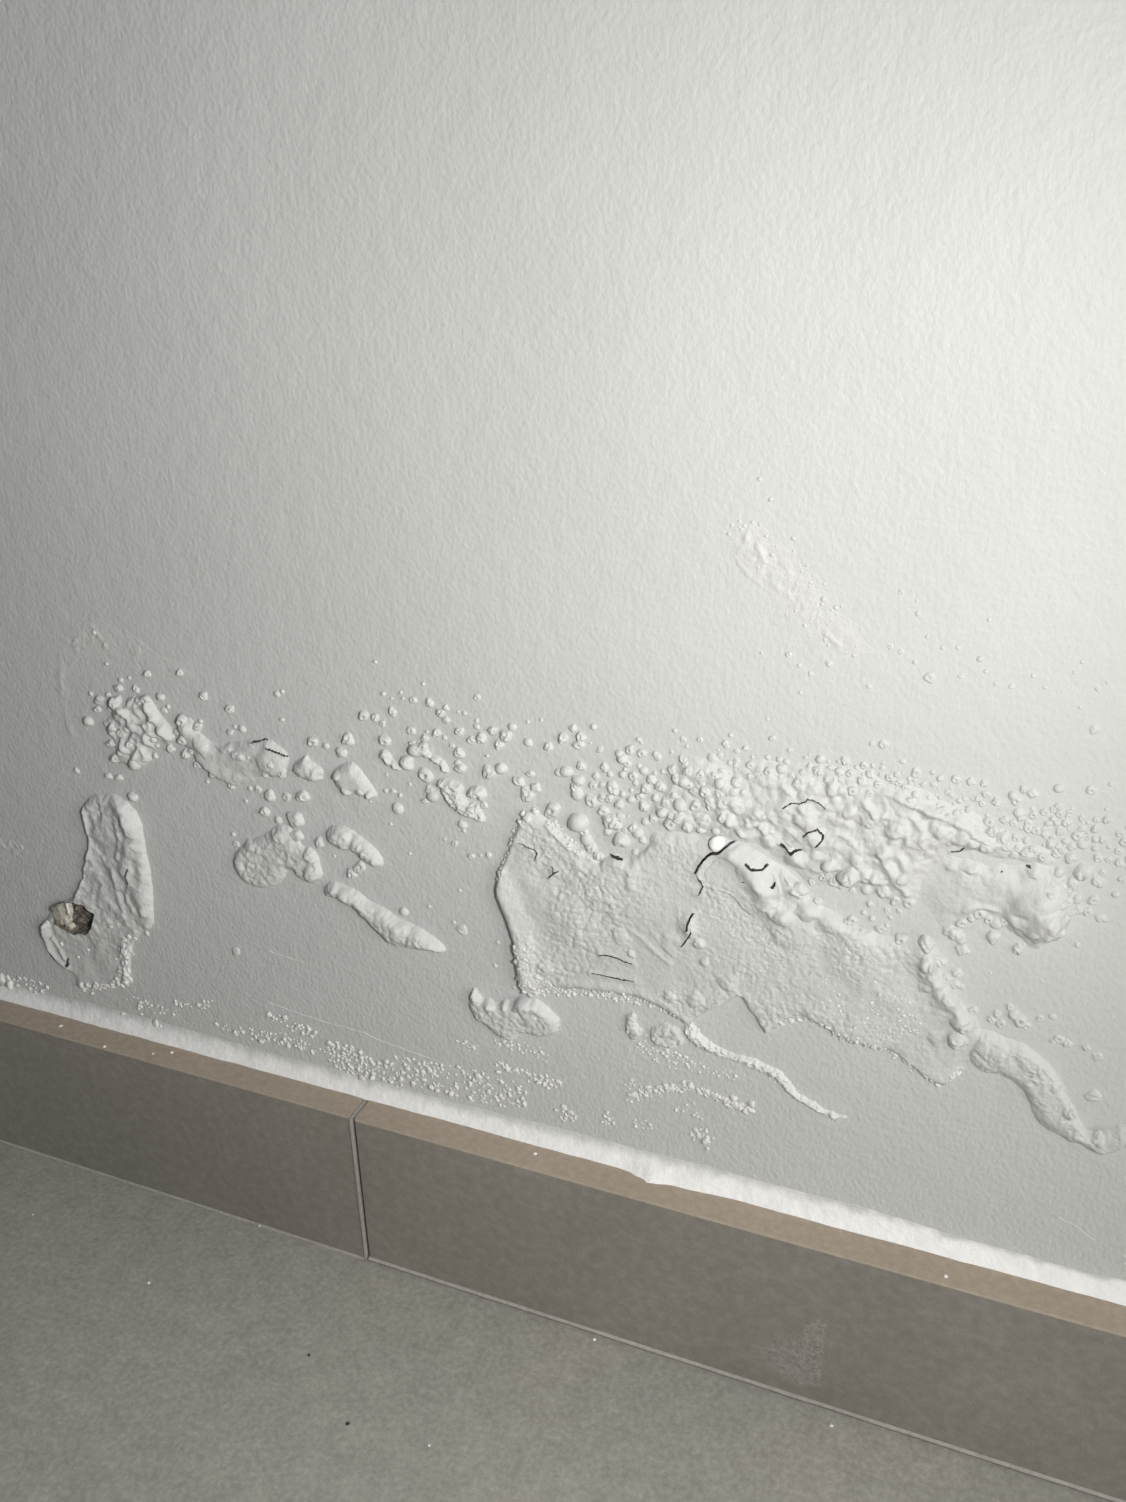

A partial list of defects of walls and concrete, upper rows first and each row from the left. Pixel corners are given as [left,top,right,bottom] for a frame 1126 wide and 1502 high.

spalling [49,901,94,935]